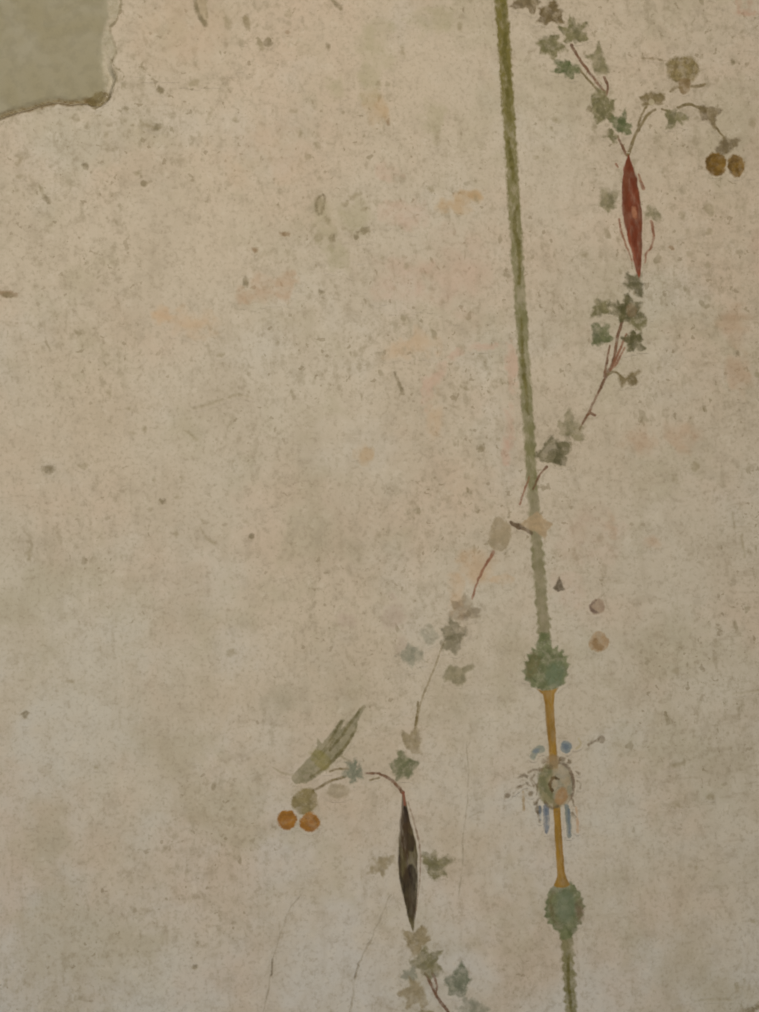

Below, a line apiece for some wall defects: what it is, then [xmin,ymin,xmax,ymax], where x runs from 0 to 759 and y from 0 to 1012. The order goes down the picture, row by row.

crack [261,892,304,1012]